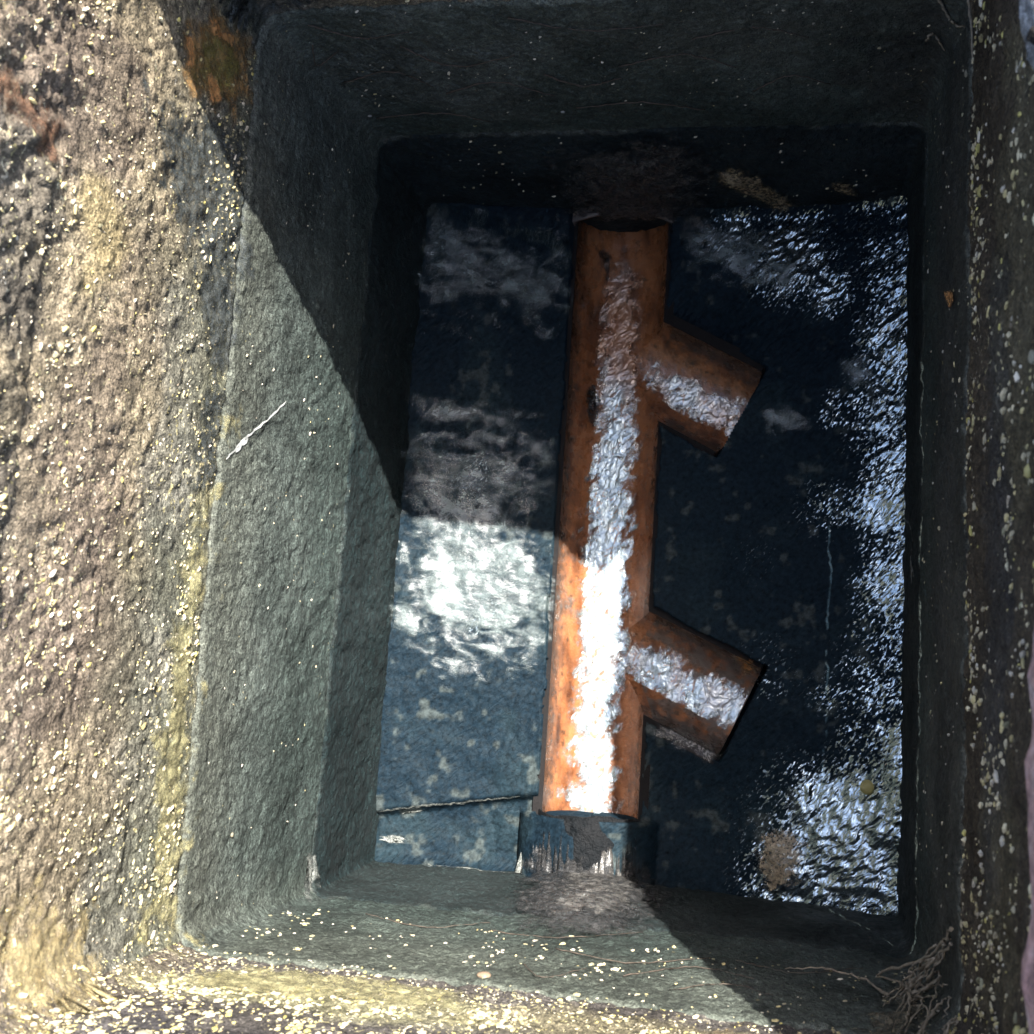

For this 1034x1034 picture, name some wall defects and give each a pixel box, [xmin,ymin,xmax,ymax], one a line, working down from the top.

corrosion [182,7,256,118]
water stain [418,225,570,322]
water stain [686,230,794,287]
water stain [424,399,503,440]
water stain [412,437,549,633]
water stain [397,608,418,634]
water stain [656,725,714,762]
water stain [377,796,520,814]
water stain [428,854,523,873]
water stain [759,832,807,891]